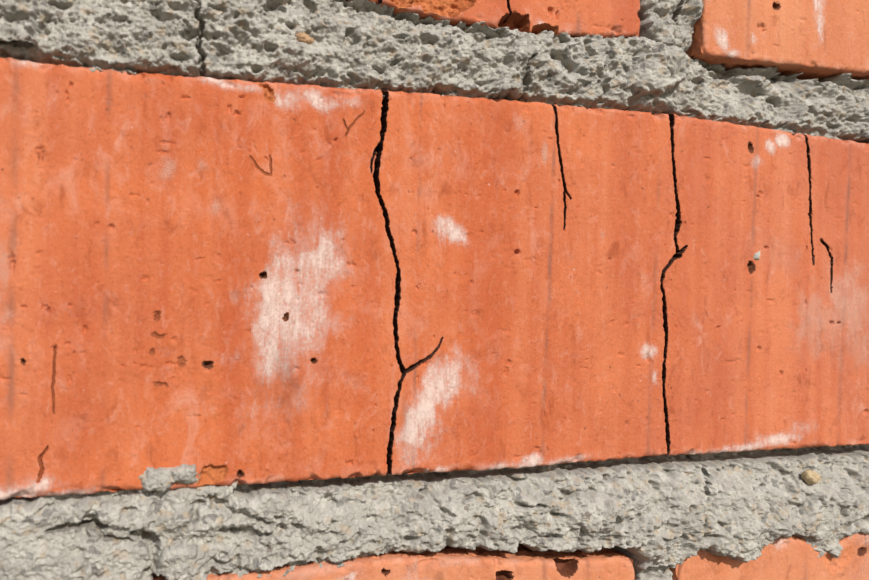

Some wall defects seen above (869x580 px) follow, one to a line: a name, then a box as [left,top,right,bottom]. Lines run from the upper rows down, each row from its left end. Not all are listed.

spalling [390,0,476,17]
crack [502,0,512,23]
crack [517,53,536,101]
crack [552,105,572,230]
damp [254,237,342,375]
crack [342,91,444,475]
crack [660,114,712,522]
damp [402,363,459,445]